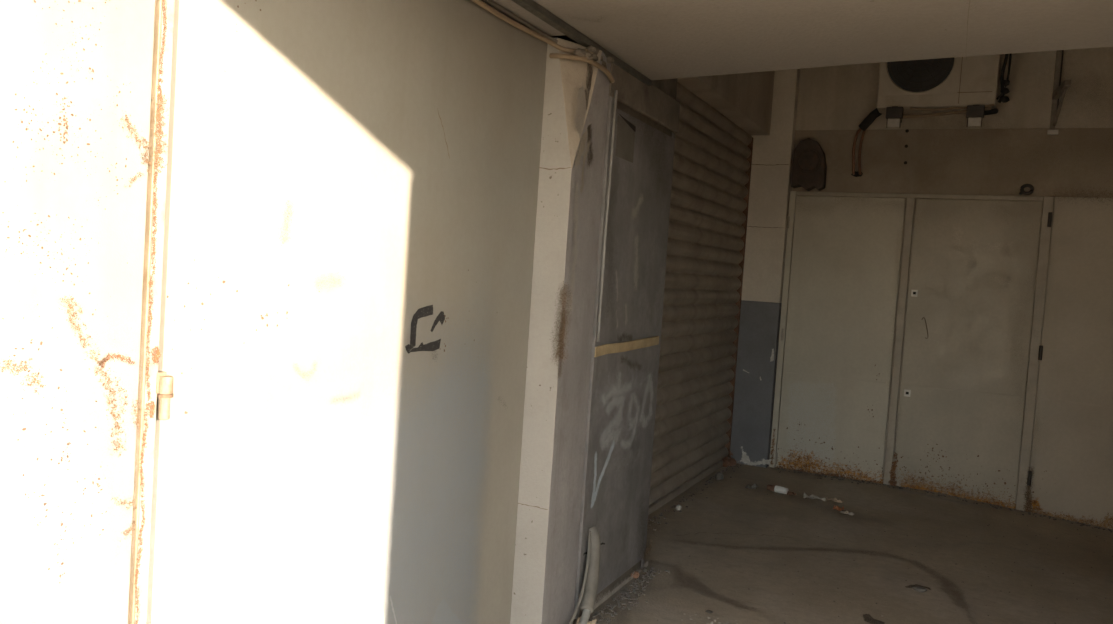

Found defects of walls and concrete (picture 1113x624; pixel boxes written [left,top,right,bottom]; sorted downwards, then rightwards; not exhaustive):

corrosion [0,0,173,624]
corrosion [776,419,1047,512]